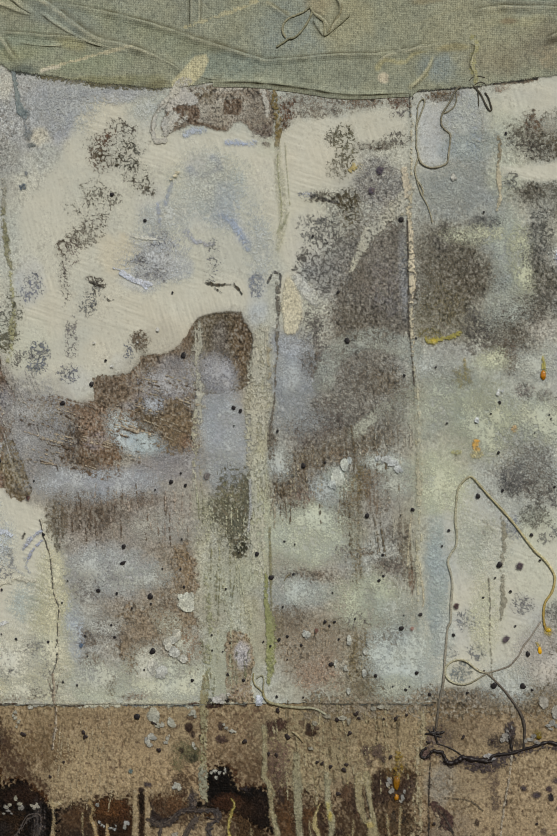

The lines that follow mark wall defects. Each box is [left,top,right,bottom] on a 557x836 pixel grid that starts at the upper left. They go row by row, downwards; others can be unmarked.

peeling [88,311,253,445]
damp [305,723,320,736]
damp [362,744,387,767]
damp [0,728,62,836]
damp [429,801,455,833]